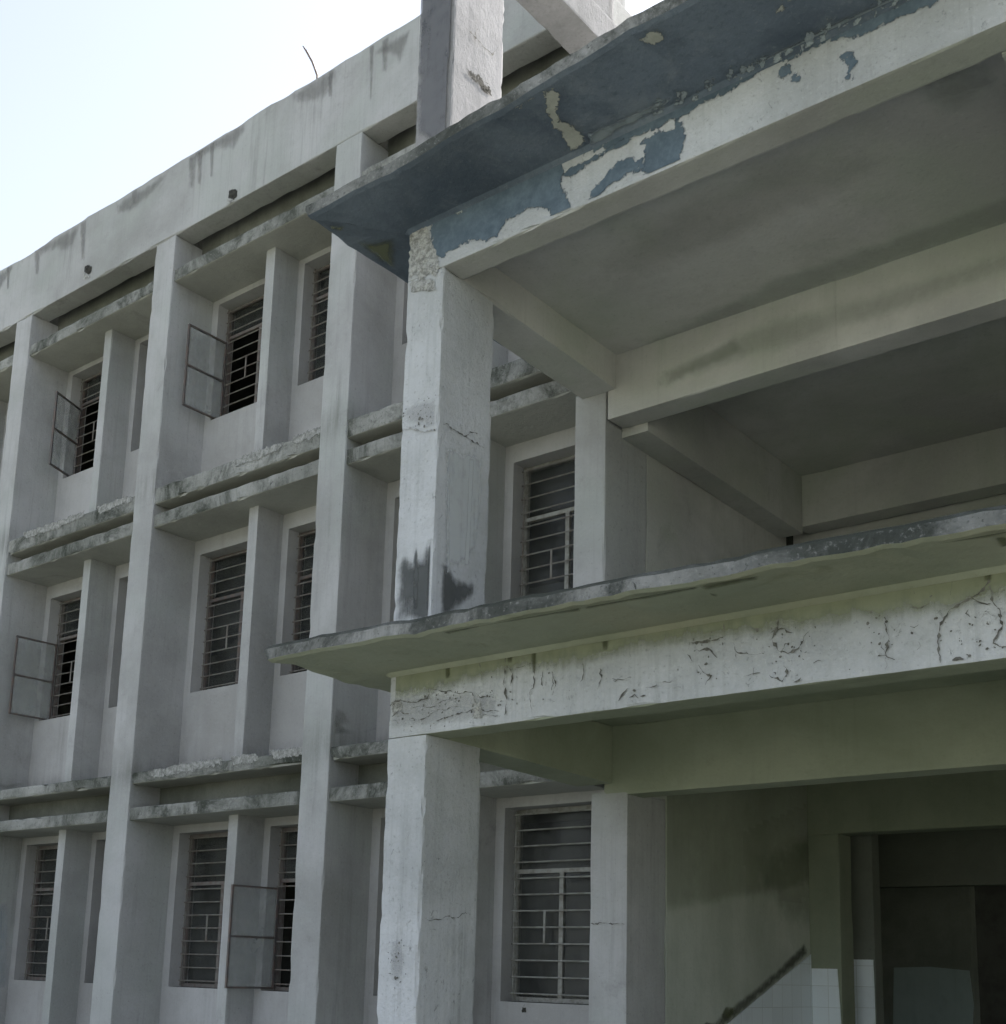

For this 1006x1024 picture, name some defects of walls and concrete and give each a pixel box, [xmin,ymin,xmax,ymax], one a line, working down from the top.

peeling [408,0,938,292]
damp [399,549,430,618]
damp [442,451,479,612]
crack [390,615,831,721]
crack [866,577,1006,663]